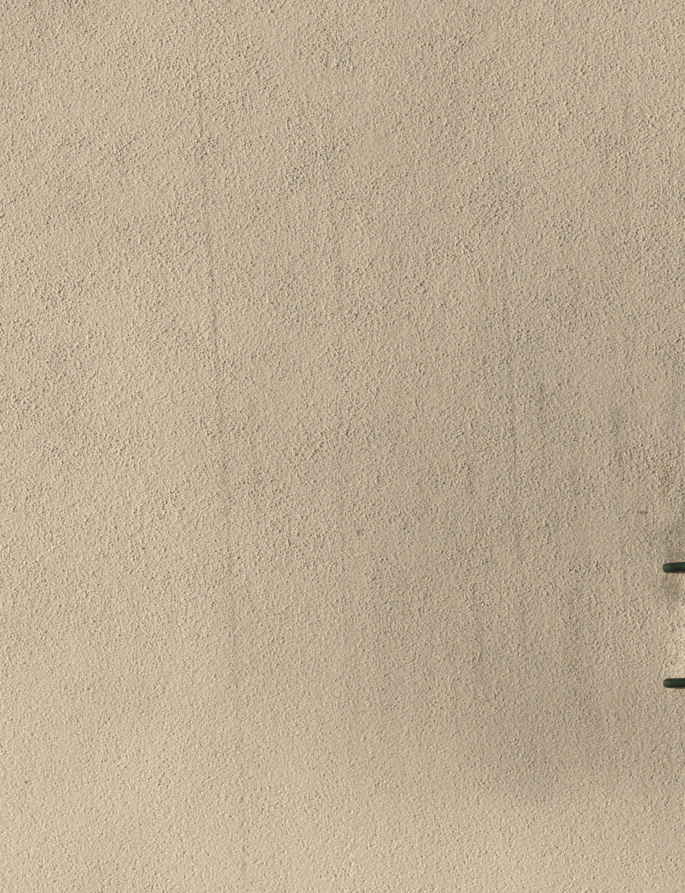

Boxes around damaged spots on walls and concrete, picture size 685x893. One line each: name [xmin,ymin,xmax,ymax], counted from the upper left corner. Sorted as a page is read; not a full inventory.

water stain [660,581,685,693]